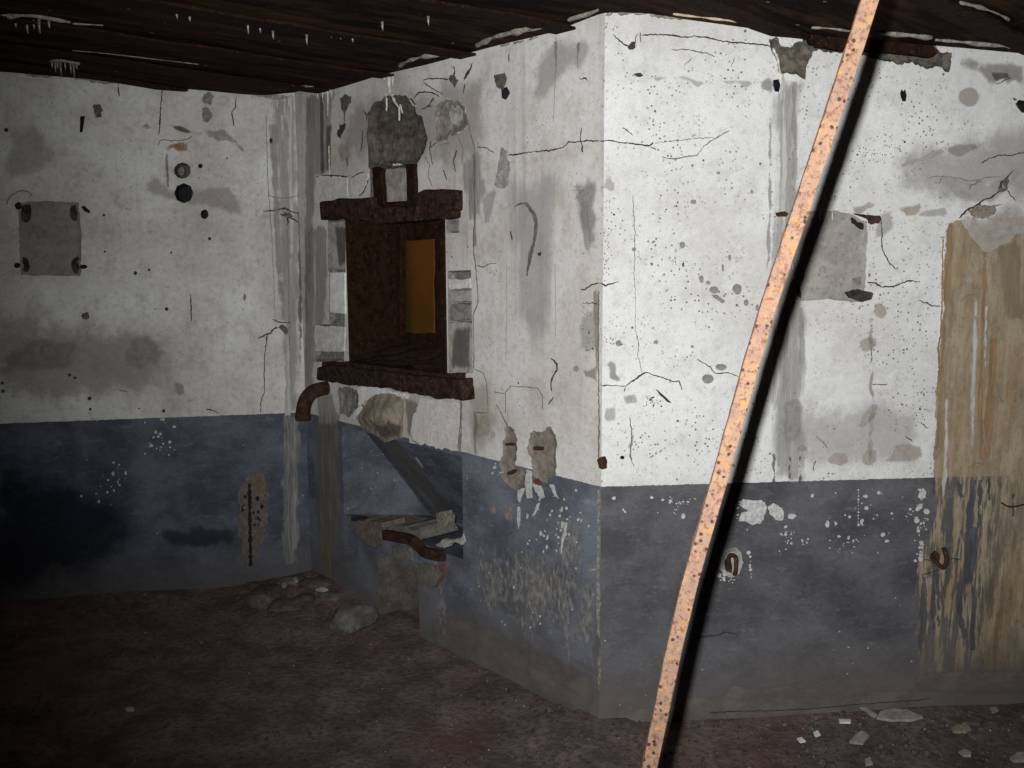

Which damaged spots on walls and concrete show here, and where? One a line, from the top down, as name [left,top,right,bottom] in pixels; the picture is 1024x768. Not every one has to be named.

spalling [769,35,848,80]
spalling [862,40,952,72]
spalling [366,75,468,169]
crack [425,50,729,466]
damp [726,47,797,265]
peeling [792,210,881,302]
crack [930,152,1024,218]
damp [965,210,1024,253]
damp [252,85,369,580]
flaking render [338,386,460,451]
damp [772,261,807,483]
rust [915,220,1024,692]